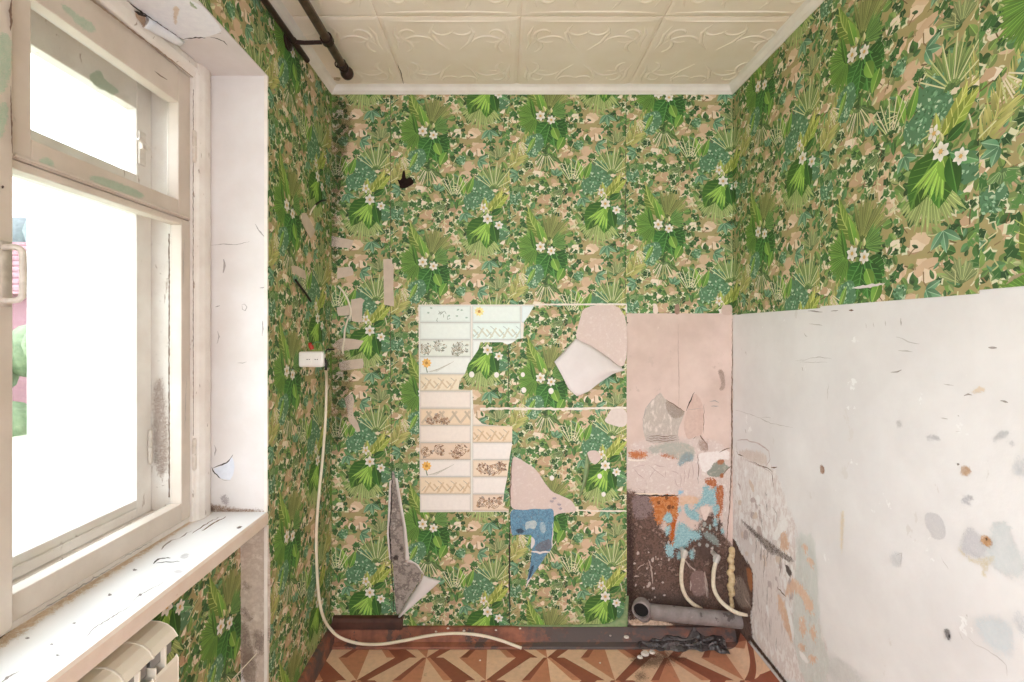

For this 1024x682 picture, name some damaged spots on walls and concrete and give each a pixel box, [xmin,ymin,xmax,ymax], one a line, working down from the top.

hole [398,170,414,189]
peeling [212,455,235,481]
flaking render [663,435,831,682]